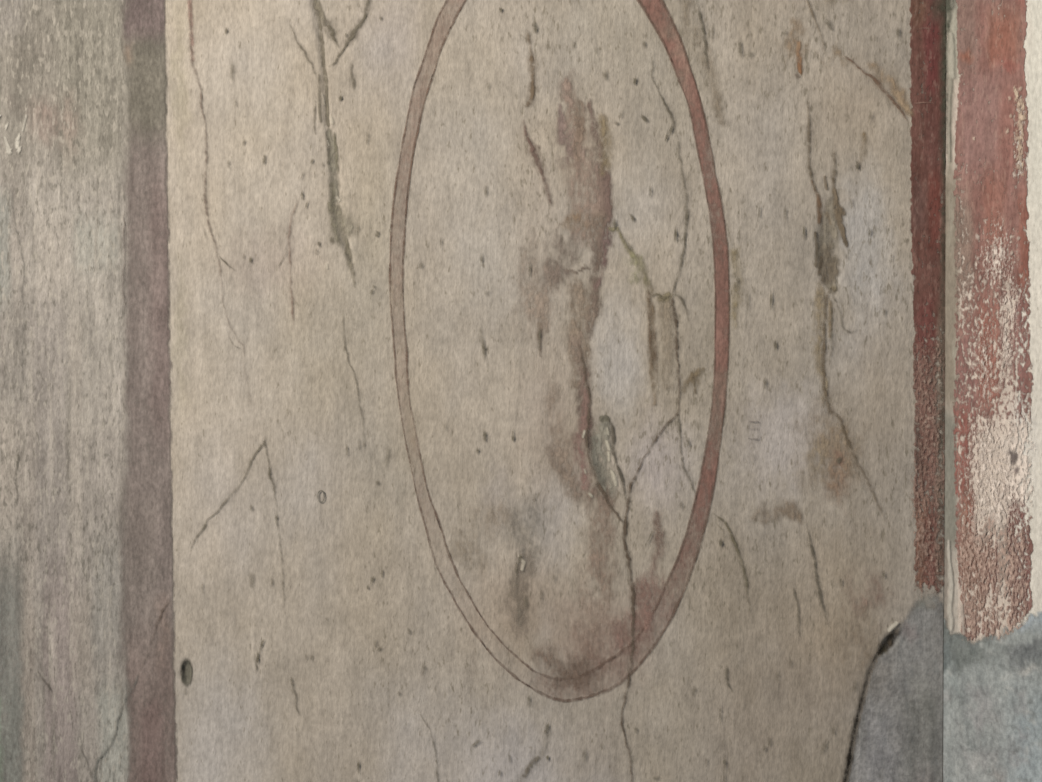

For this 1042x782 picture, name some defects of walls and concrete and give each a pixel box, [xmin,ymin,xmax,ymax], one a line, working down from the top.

crack [186,0,194,50]
crack [200,89,227,271]
crack [243,441,275,495]
crack [581,160,693,781]
leakage [609,227,671,379]
crack [822,295,864,473]
peeling [958,416,1033,640]
peeling [976,227,1020,397]